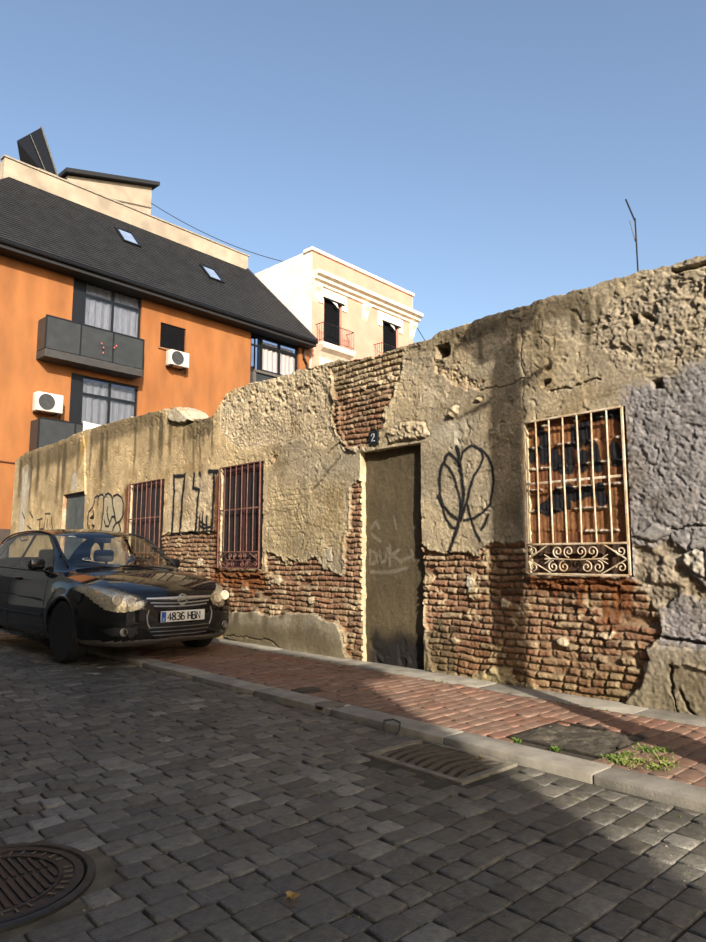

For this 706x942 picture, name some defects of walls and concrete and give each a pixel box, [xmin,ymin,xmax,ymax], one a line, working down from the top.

spalling [220,347,406,468]
spalling [161,478,363,661]
spalling [421,524,706,704]
crack [660,635,706,715]